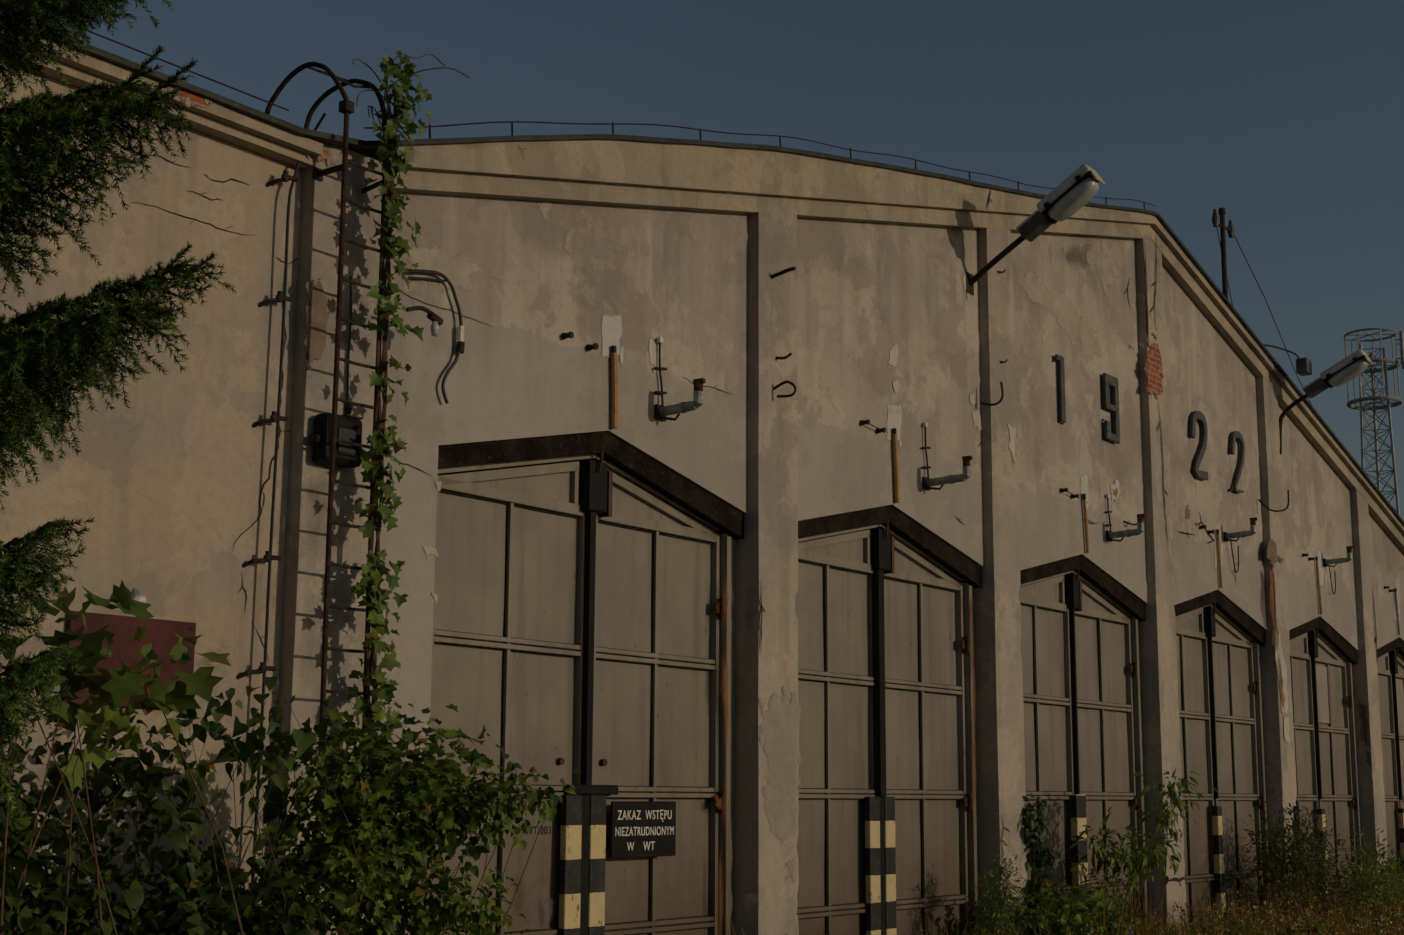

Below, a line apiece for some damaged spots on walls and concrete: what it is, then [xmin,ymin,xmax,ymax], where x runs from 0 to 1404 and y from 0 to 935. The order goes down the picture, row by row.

crack [132,155,249,235]
flaking render [1139,333,1164,399]